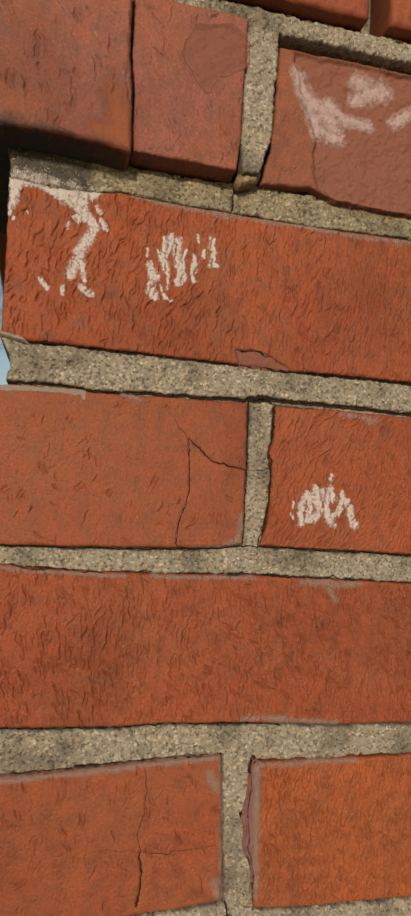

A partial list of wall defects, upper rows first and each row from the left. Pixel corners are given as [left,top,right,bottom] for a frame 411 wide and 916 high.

crack [29,340,411,385]
spalling [235,349,289,372]
crack [6,389,411,573]
crack [226,571,357,581]
crack [0,722,281,730]
crack [14,754,215,916]
crack [247,773,255,900]